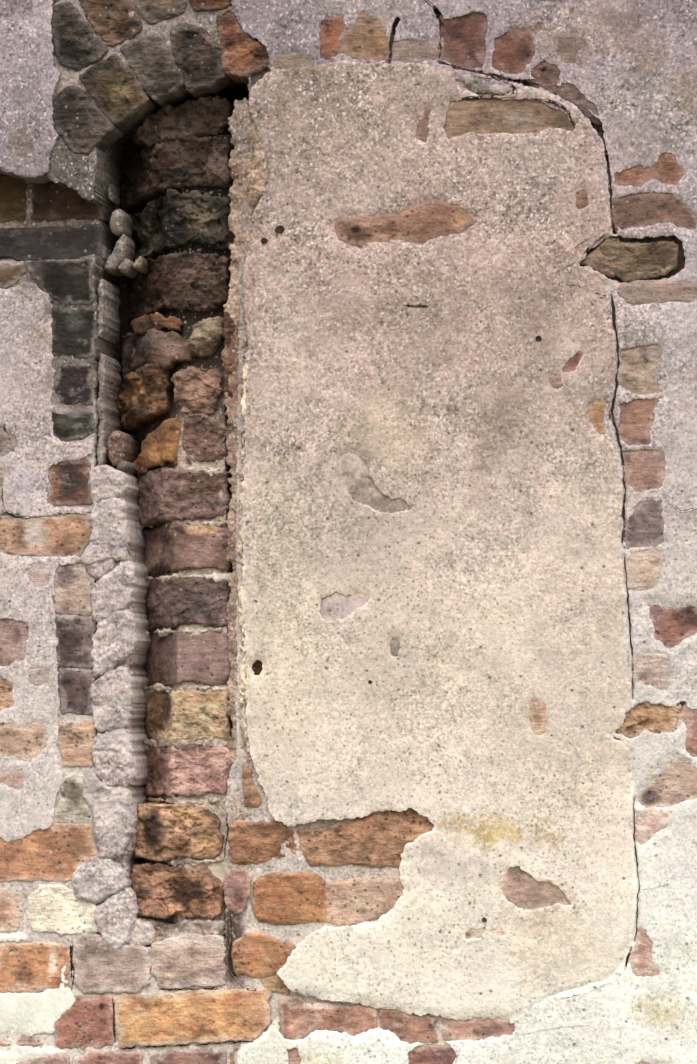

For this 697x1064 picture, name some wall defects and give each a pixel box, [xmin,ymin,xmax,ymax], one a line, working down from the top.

crack [389,21,399,62]
peeling [268,11,602,142]
peeling [580,152,697,305]
crack [424,0,634,699]
peeling [586,345,666,591]
peeling [0,618,49,710]
peeling [631,603,697,690]
peeling [0,722,47,789]
peeling [614,701,697,845]
peeling [223,765,515,1064]
peeling [501,866,571,910]
peeling [629,927,660,977]